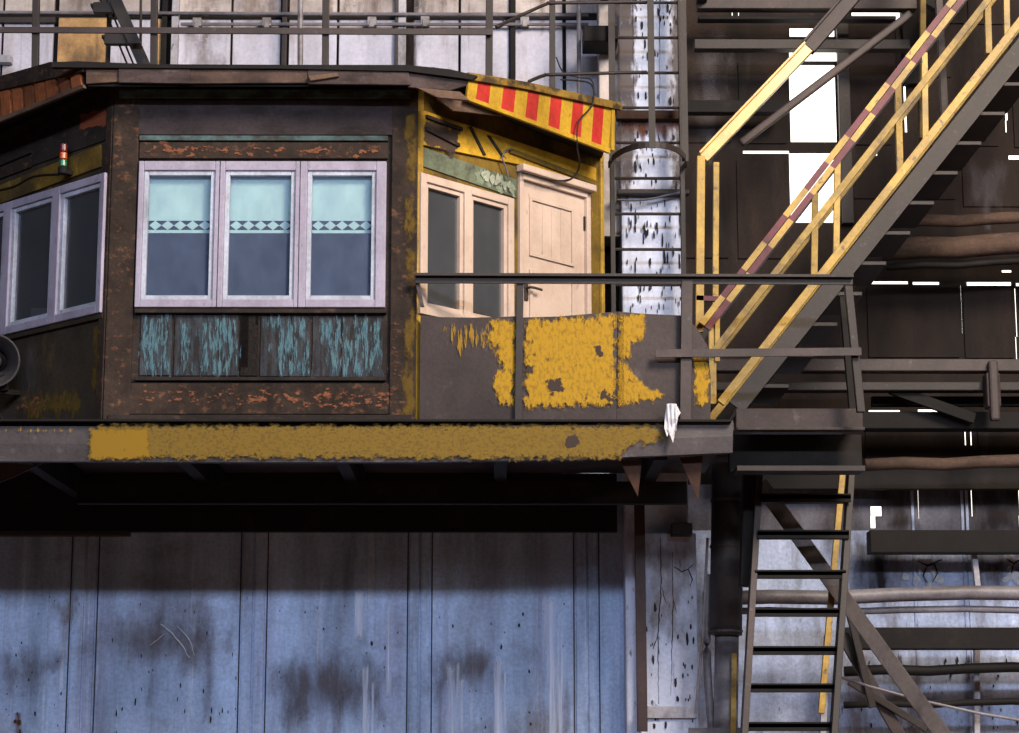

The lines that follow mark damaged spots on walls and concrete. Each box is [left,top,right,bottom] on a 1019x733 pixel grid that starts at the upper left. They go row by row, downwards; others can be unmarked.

peeling [615,0,679,110]
peeling [144,141,206,157]
peeling [297,143,381,159]
peeling [404,115,418,183]
peeling [474,169,516,198]
peeling [617,122,681,274]
peeling [444,286,681,408]
peeling [87,310,665,462]
water stain [355,593,363,637]
water stain [363,668,373,733]
water stain [494,661,506,733]
water stain [546,599,563,733]